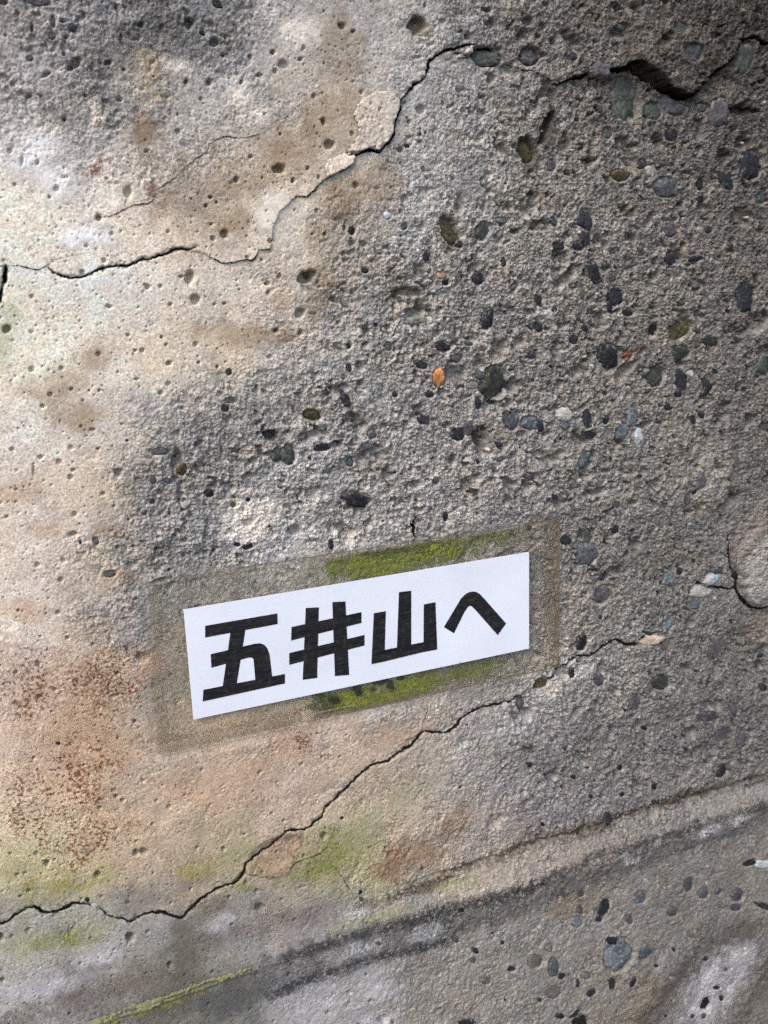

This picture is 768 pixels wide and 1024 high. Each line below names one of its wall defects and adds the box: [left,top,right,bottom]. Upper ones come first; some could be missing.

peeling [325,91,400,176]
crack [0,35,768,308]
crack [688,534,768,610]
corrosion [0,643,158,876]
crack [0,629,663,925]